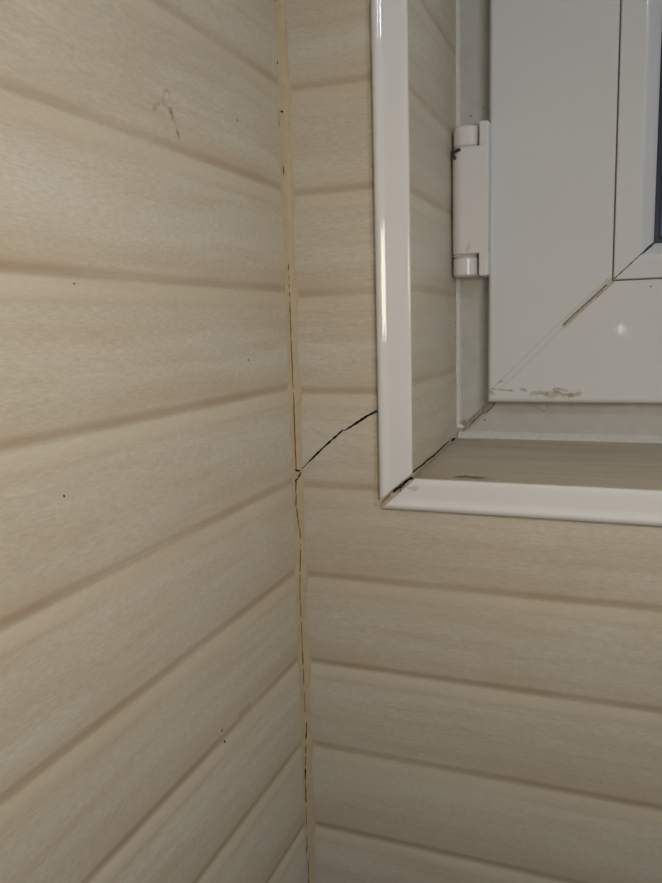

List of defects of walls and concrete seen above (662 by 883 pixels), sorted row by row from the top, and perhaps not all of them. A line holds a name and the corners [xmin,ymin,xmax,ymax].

crack [413,438,456,476]